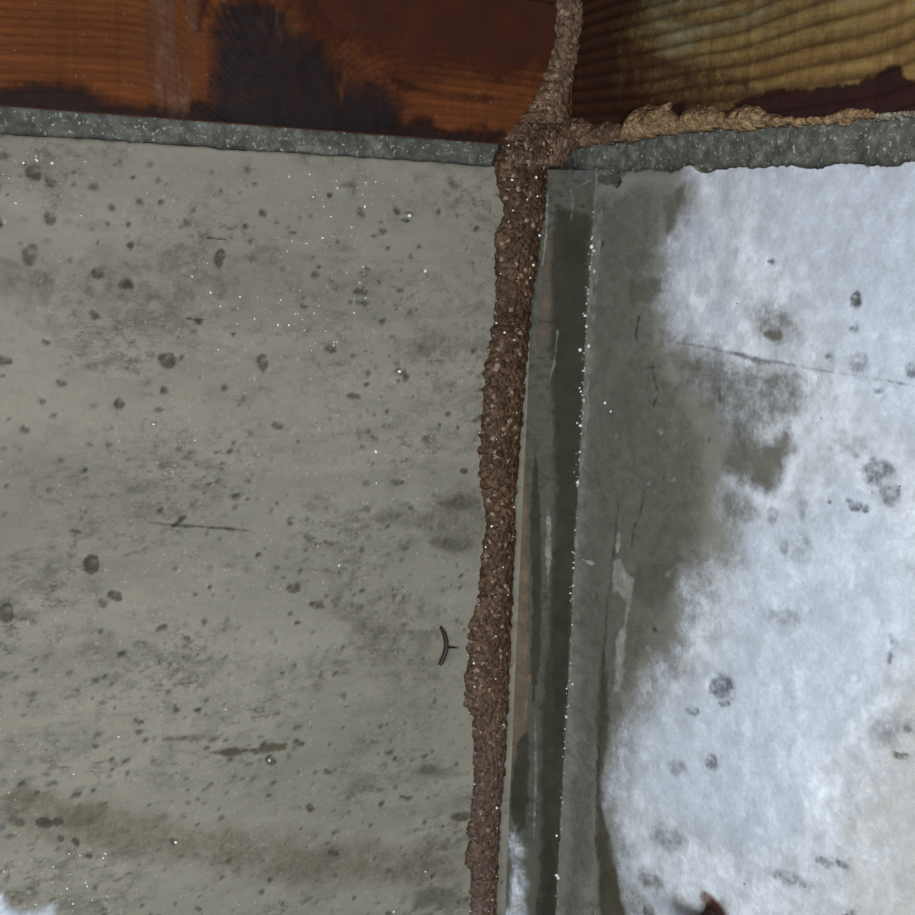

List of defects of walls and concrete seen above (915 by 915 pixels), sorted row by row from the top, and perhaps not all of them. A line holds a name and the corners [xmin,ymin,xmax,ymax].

leakage [0,0,557,144]
leakage [571,0,915,125]
leakage [530,161,915,915]
leakage [509,735,529,854]
leakage [506,870,523,915]
corrosion [701,893,724,915]